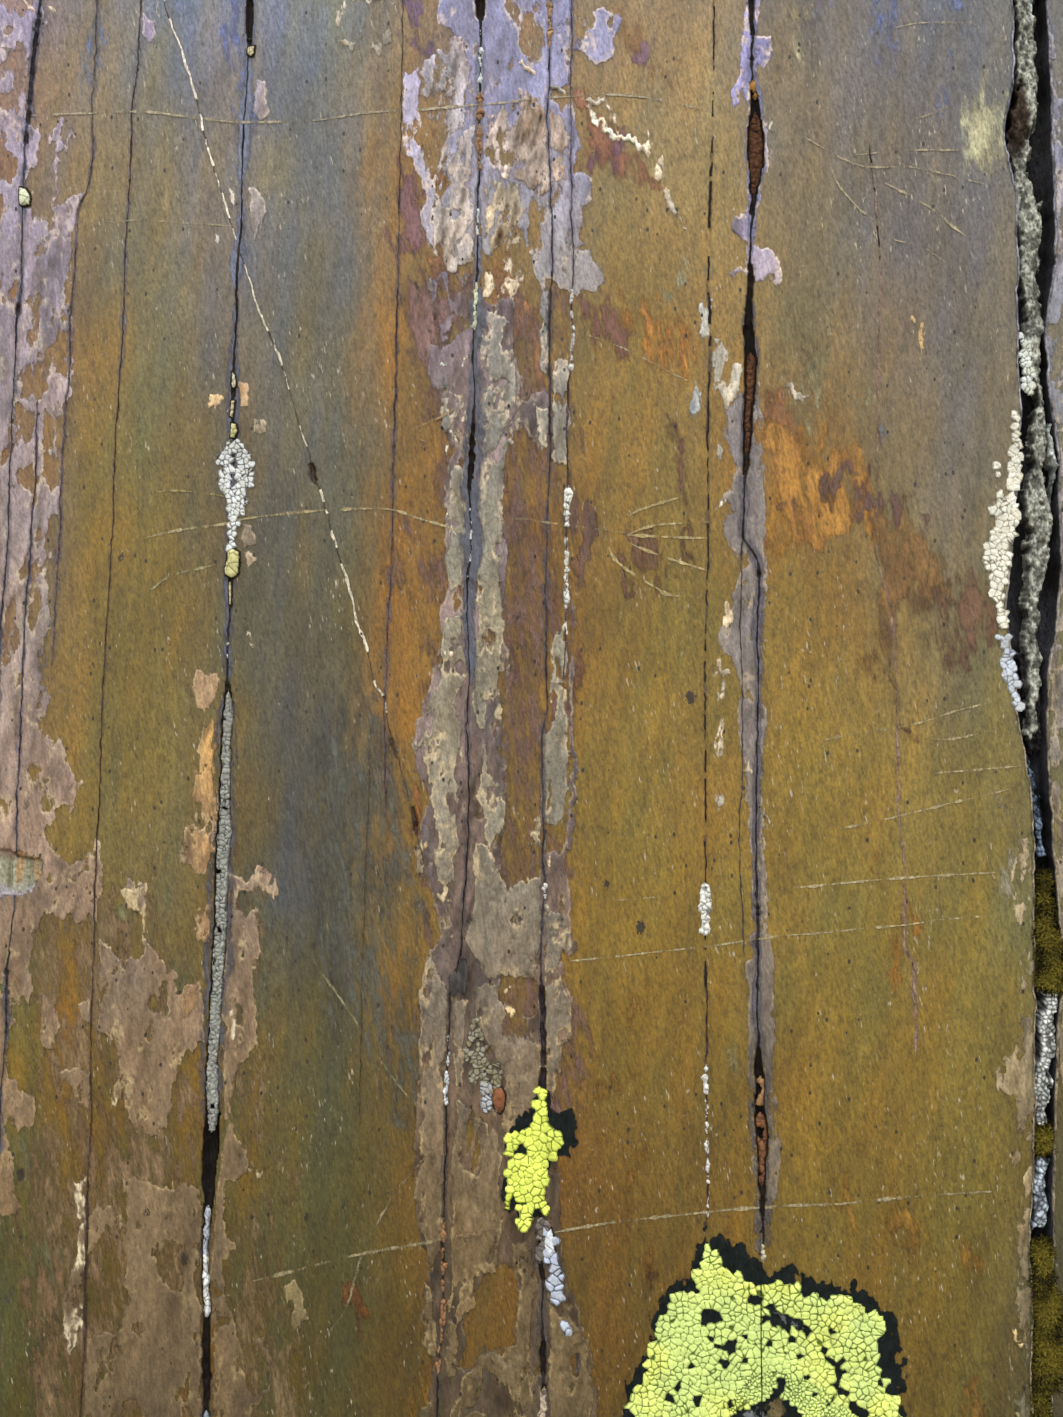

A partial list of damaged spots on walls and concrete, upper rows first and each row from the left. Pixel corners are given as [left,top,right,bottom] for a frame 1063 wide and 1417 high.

spalling [0,850,43,898]
crack [0,0,100,1154]
crack [79,0,425,1417]
crack [435,0,487,1417]
crack [532,1212,549,1417]
crack [538,0,574,1089]
crack [702,935,710,1059]
crack [704,0,771,1417]
crack [1003,0,1063,1415]